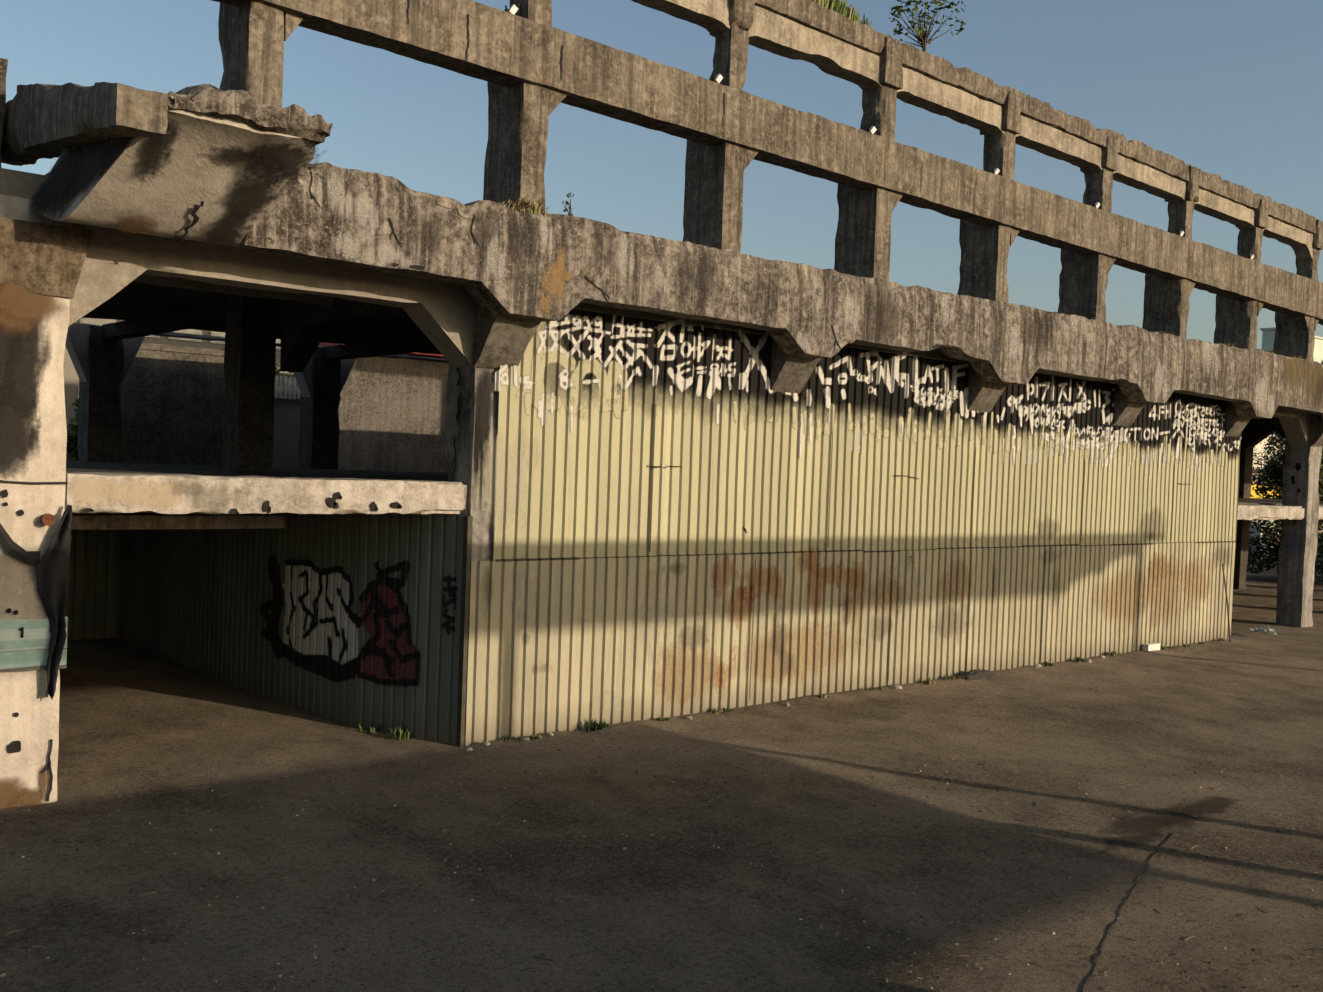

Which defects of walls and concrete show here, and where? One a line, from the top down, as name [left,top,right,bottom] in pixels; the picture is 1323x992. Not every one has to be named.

damp [30,120,180,217]
damp [206,136,319,250]
spalling [298,168,318,186]
damp [118,216,157,235]
crack [162,201,204,242]
damp [0,282,57,477]
spalling [327,492,342,509]
spalling [371,502,403,512]